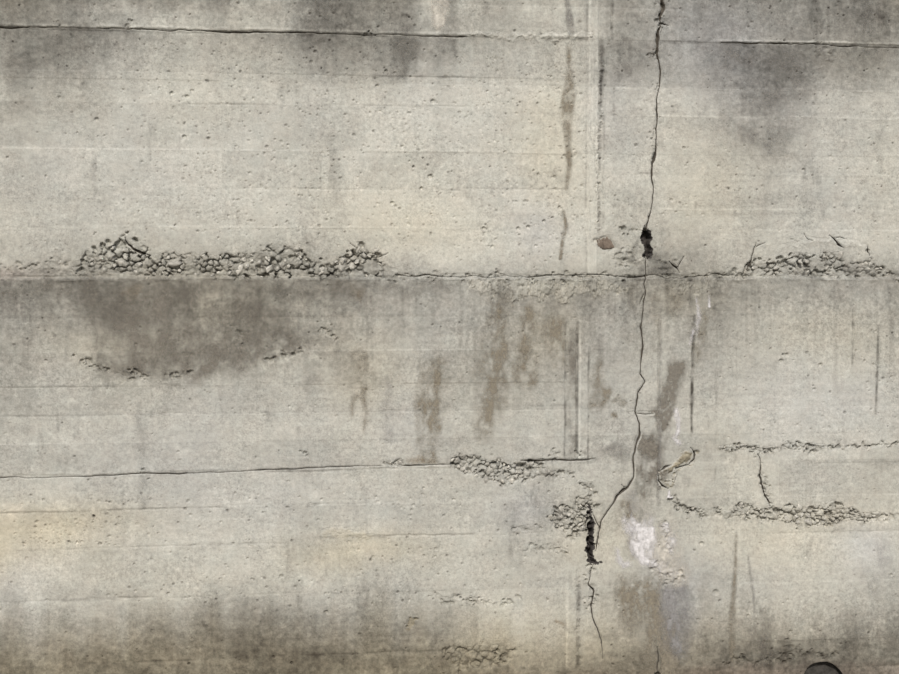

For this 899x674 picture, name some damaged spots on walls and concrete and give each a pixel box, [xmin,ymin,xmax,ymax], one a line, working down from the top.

spalling [0,28,899,311]
crack [643,0,669,231]
water stain [418,367,441,431]
water stain [483,308,508,423]
spalling [449,448,601,558]
crack [350,242,765,659]
crack [757,454,771,506]
spalling [645,450,899,588]
spalling [717,437,899,456]
water stain [617,518,686,653]
spalling [441,640,522,674]